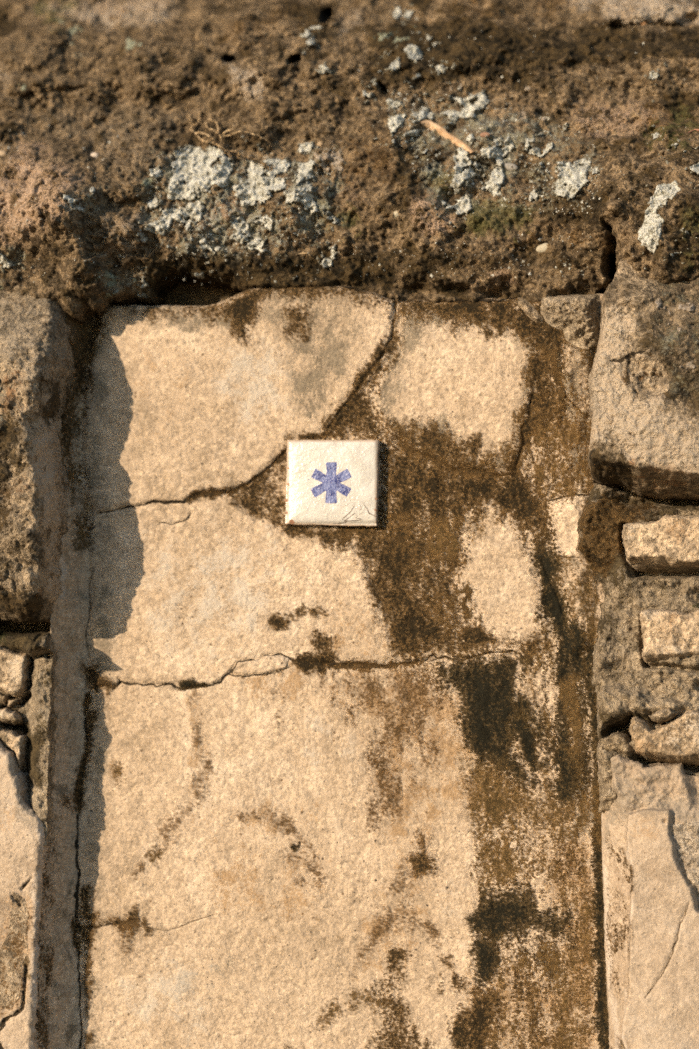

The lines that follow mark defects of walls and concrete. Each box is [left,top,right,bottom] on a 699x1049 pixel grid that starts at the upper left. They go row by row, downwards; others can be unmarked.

crack [326,300,422,429]
water stain [553,337,597,408]
crack [97,458,277,525]
water stain [381,515,475,639]
water stain [364,732,439,833]
crack [73,649,516,1048]
water stain [405,828,437,878]
water stain [497,643,622,1049]
crack [0,966,28,1049]
water stain [467,932,500,988]